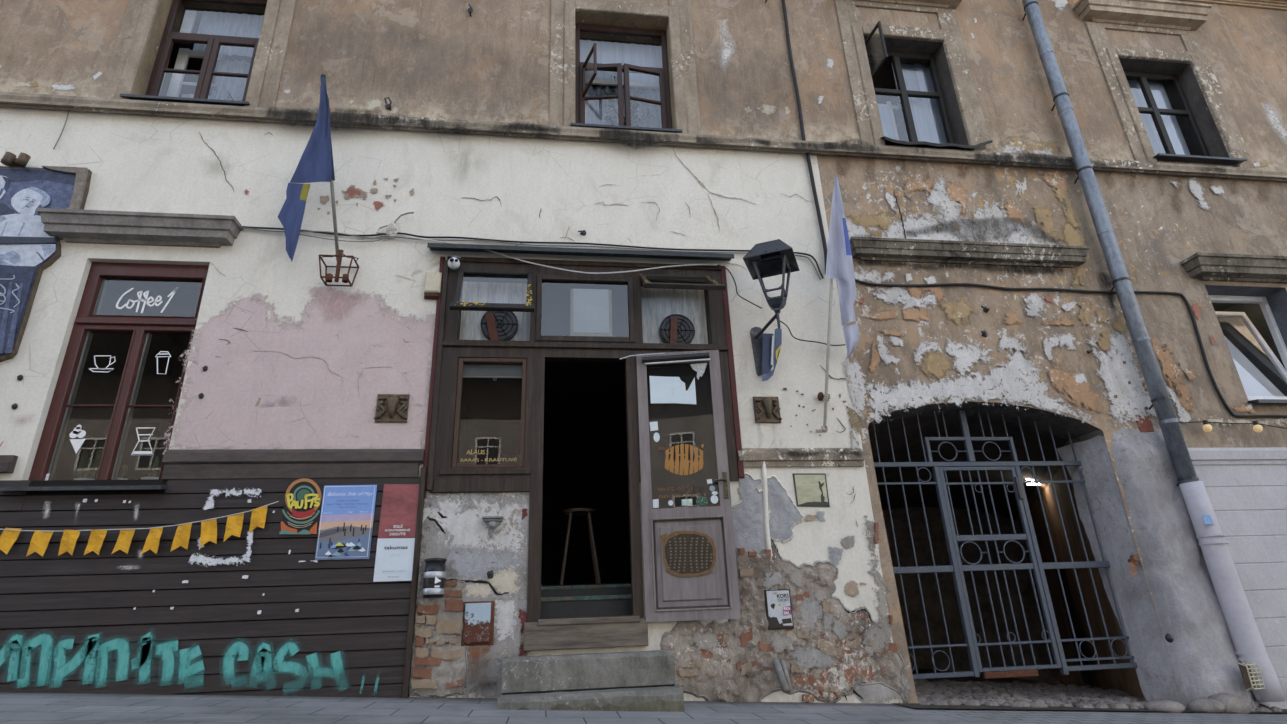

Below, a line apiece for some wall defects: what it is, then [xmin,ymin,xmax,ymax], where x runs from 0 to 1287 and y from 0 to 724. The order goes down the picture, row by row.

peeling [317,178,414,215]
crack [595,147,815,236]
peeling [846,131,1087,246]
peeling [1171,177,1225,210]
peeling [832,263,1159,449]
peeling [1147,330,1287,426]
spalling [410,563,527,698]
spalling [660,472,908,703]